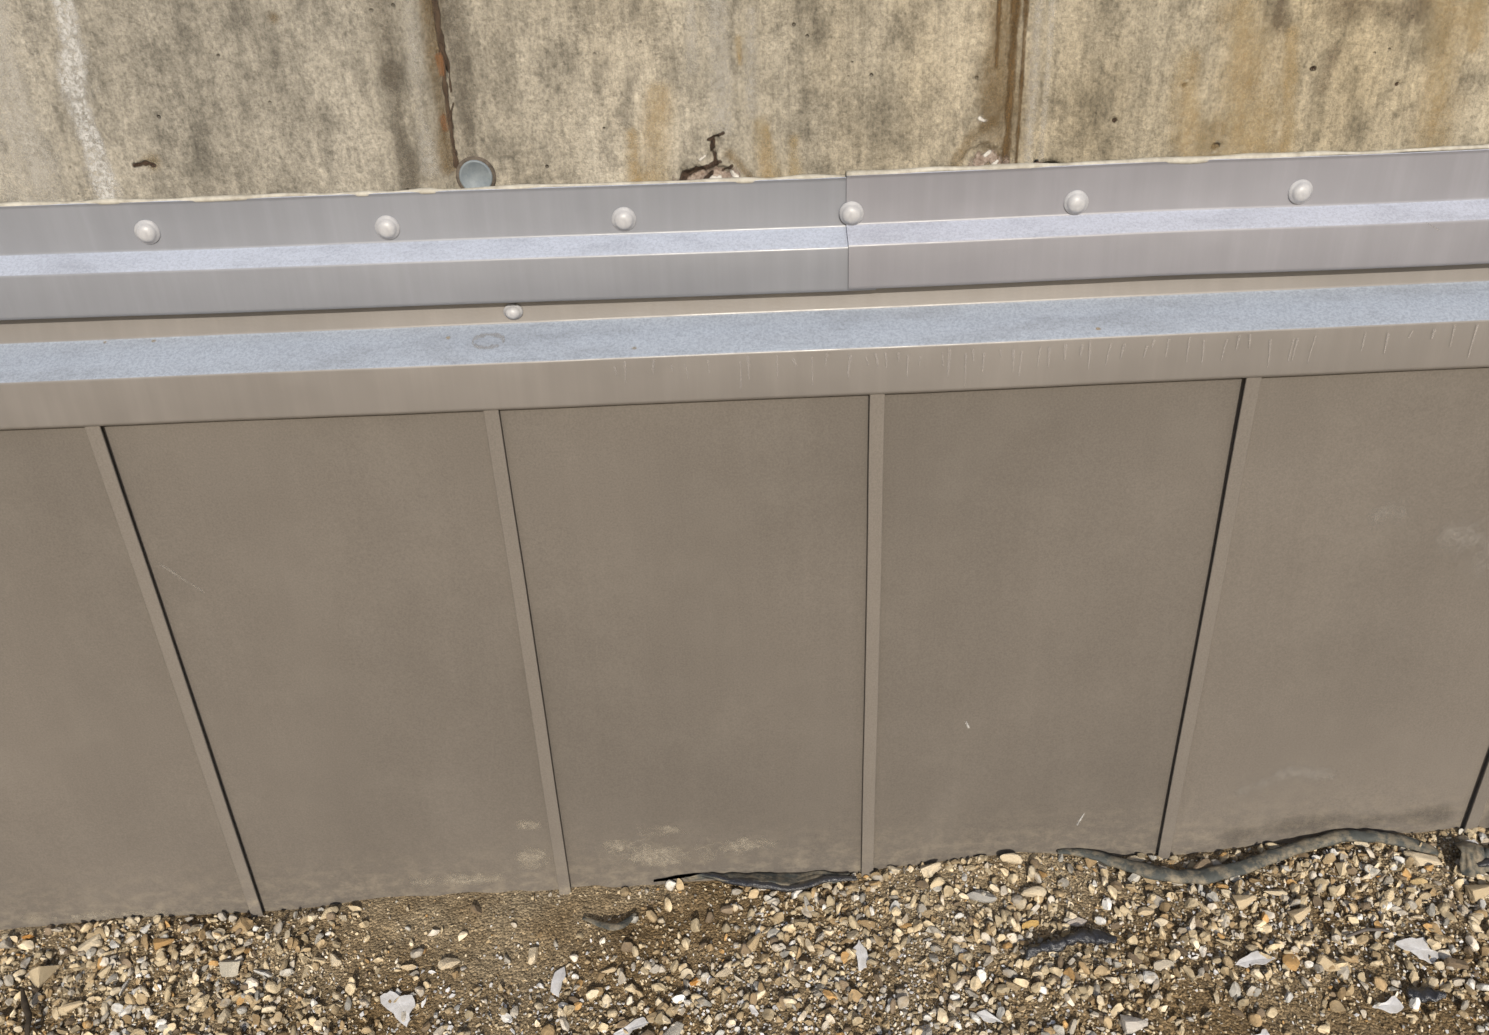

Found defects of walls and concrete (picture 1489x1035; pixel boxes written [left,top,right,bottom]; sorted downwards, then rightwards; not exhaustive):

spalling [673,131,751,181]